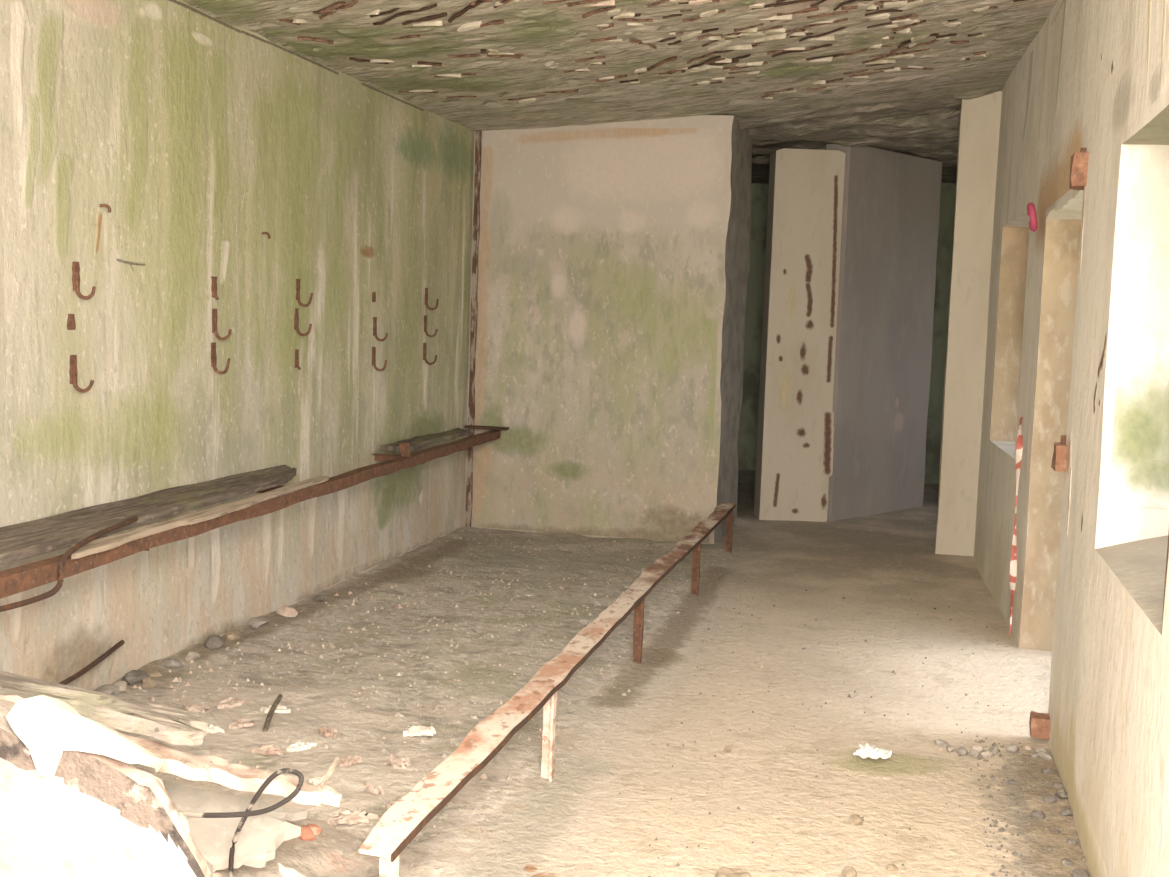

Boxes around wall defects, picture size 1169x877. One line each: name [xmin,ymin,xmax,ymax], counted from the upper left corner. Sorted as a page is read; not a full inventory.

water stain [48,0,154,243]
water stain [206,46,281,396]
water stain [311,95,366,382]
corrosion [775,332,784,363]
corrosion [772,472,800,515]
corrosion [795,410,834,512]
corrosion [795,174,840,408]